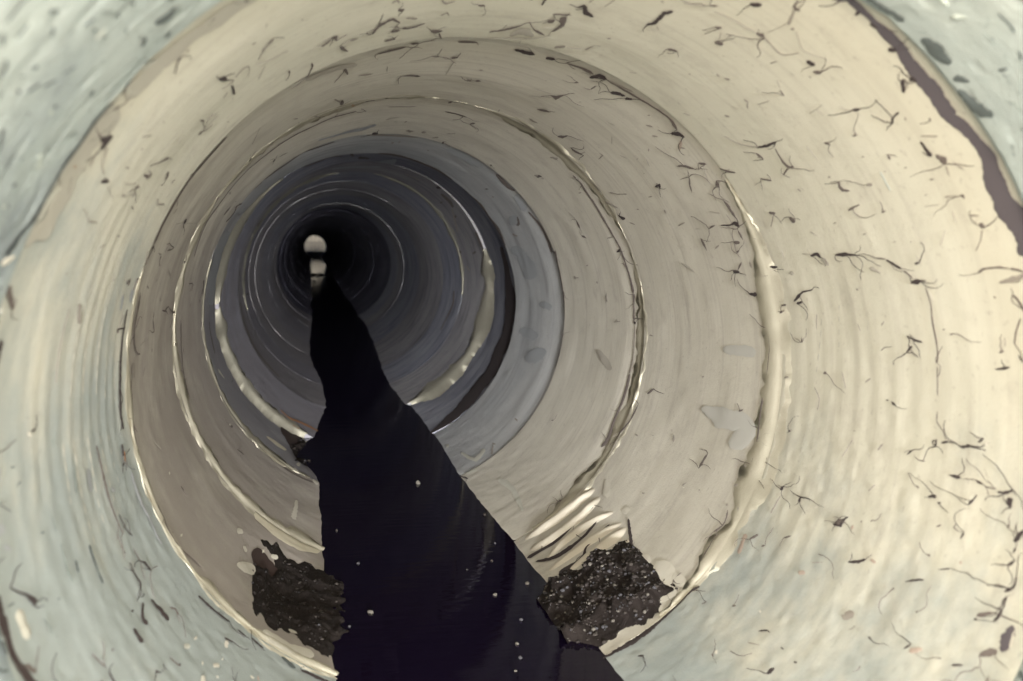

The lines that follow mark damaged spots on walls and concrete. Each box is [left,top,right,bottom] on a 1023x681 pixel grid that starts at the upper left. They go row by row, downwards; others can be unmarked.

spalling [237,546,278,576]
peeling [642,554,687,612]
peeling [263,629,314,658]